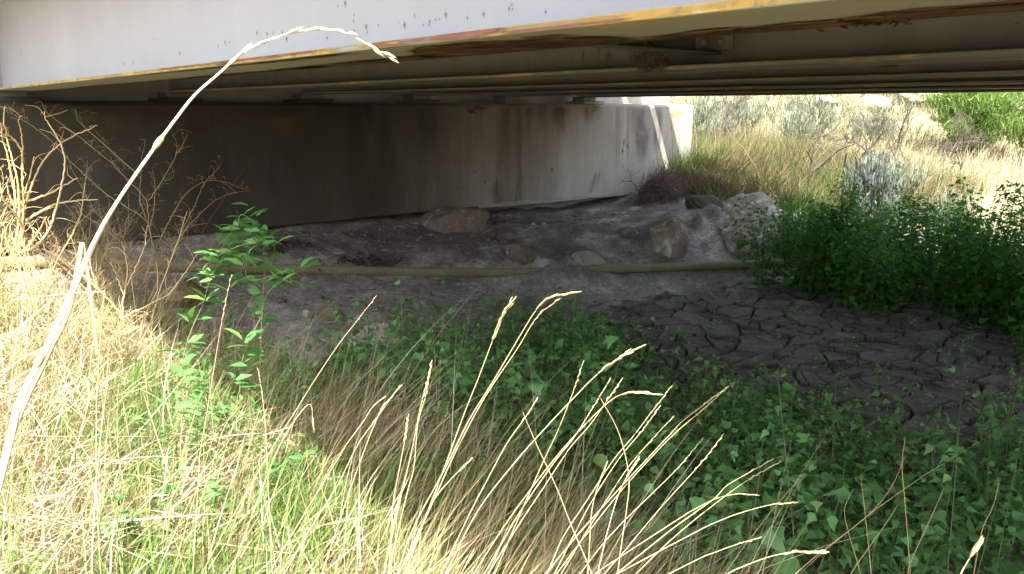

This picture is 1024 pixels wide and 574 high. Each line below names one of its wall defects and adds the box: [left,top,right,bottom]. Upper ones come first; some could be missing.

corrosion [5,0,1024,89]